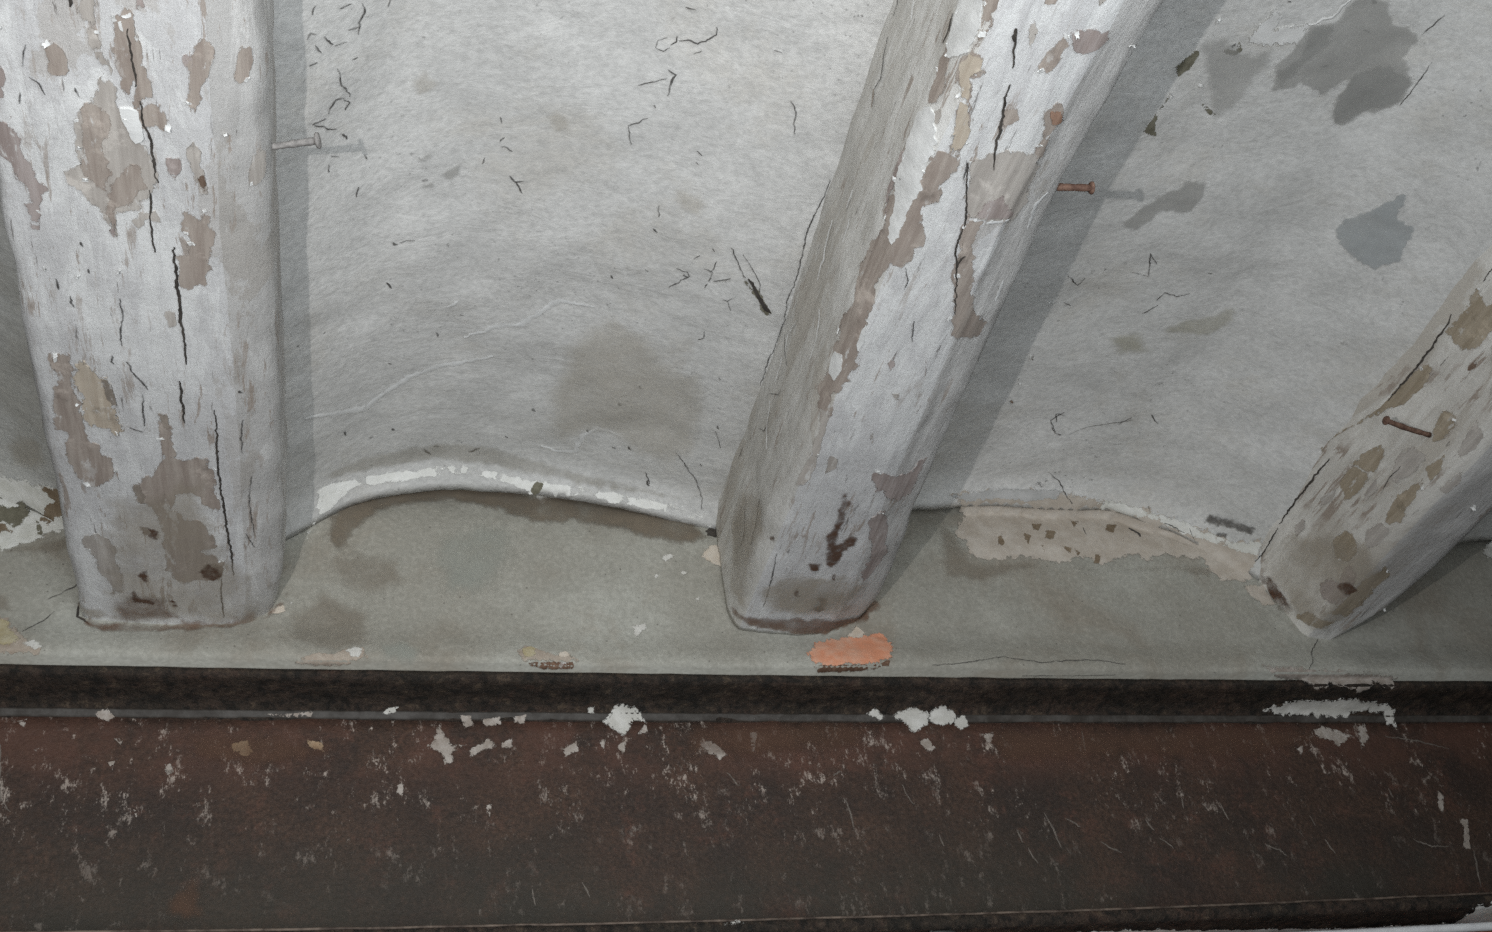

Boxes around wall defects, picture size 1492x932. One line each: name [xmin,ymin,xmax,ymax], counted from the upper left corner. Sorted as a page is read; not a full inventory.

peeling [1029,22,1109,74]
water stain [1274,0,1417,124]
peeling [0,116,48,230]
crack [55,242,89,308]
peeling [63,0,216,290]
crack [110,29,255,618]
peeling [796,0,1064,485]
water stain [1337,195,1413,269]
peeling [0,476,64,552]
peeling [48,352,226,584]
peeling [950,487,1276,606]
peeling [1296,410,1483,629]